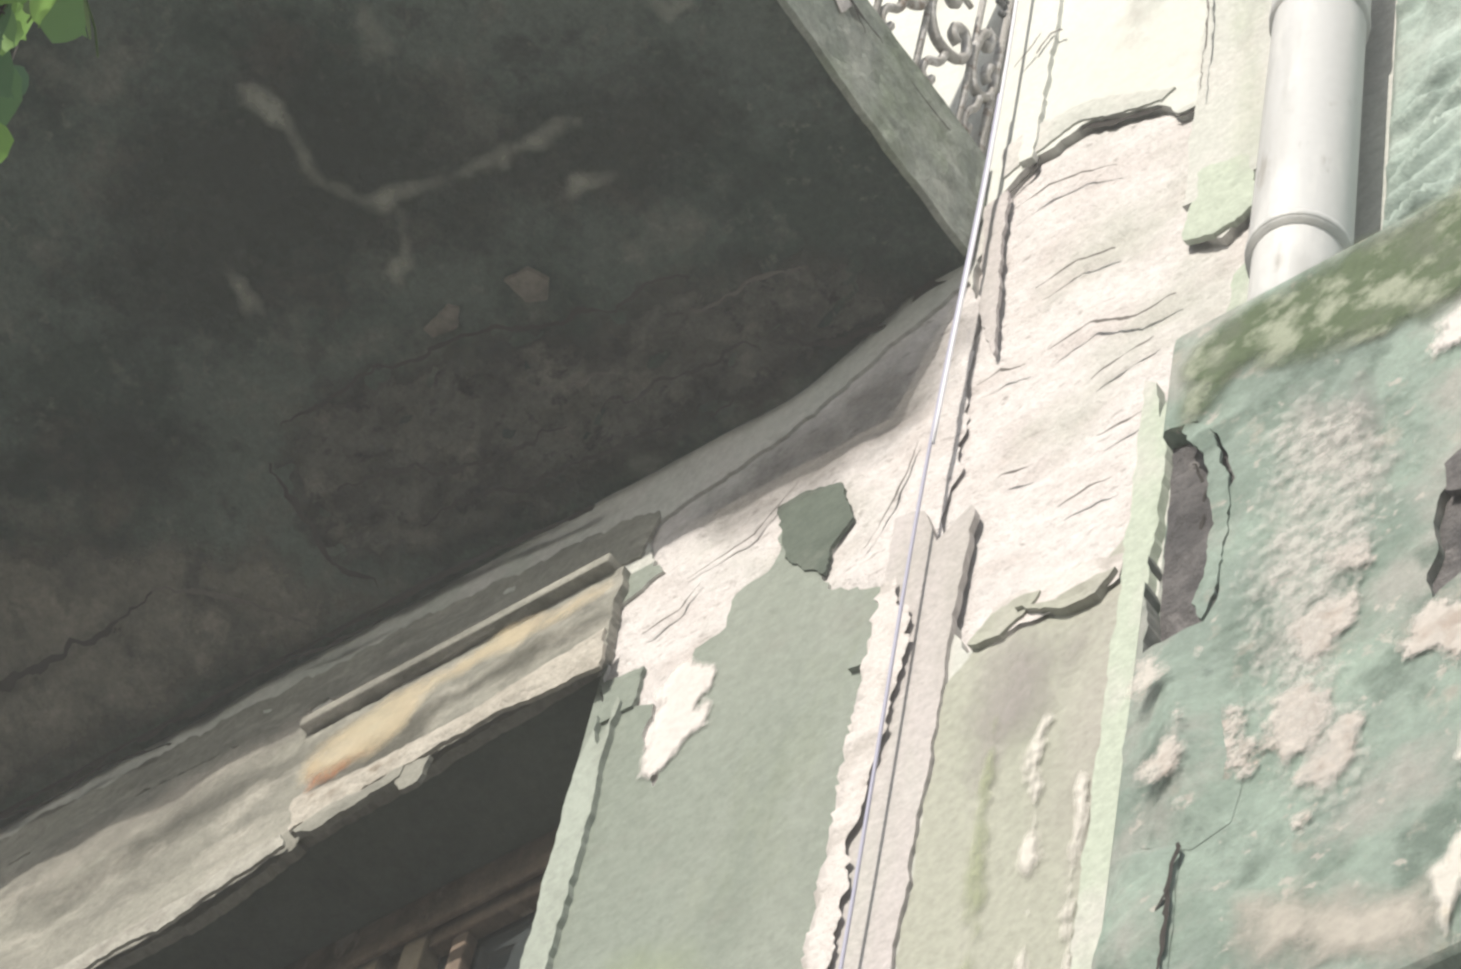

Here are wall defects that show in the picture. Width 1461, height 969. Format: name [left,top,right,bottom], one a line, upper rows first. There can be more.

crack [1014,29,1063,67]
crack [1080,0,1210,131]
crack [1010,158,1040,193]
leakage [1433,307,1461,353]
spalling [55,87,1256,969]
peeling [1325,540,1370,567]
peeling [1399,449,1461,659]
crack [0,505,595,820]
peeling [1287,584,1358,659]
peeling [1222,680,1364,787]
crack [1155,841,1181,969]